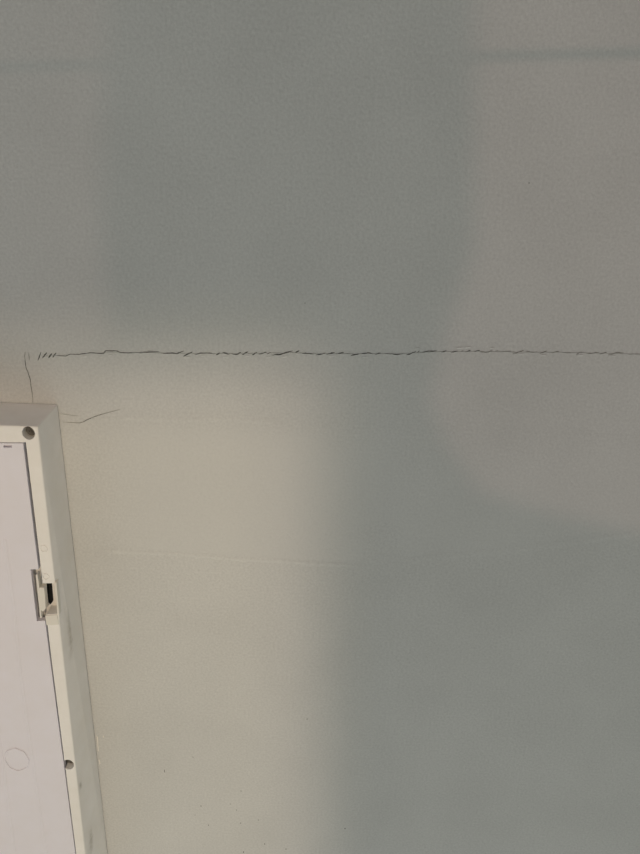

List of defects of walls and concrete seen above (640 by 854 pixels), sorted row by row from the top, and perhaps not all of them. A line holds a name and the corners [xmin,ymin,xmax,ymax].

crack [24,347,640,402]
crack [59,409,120,424]